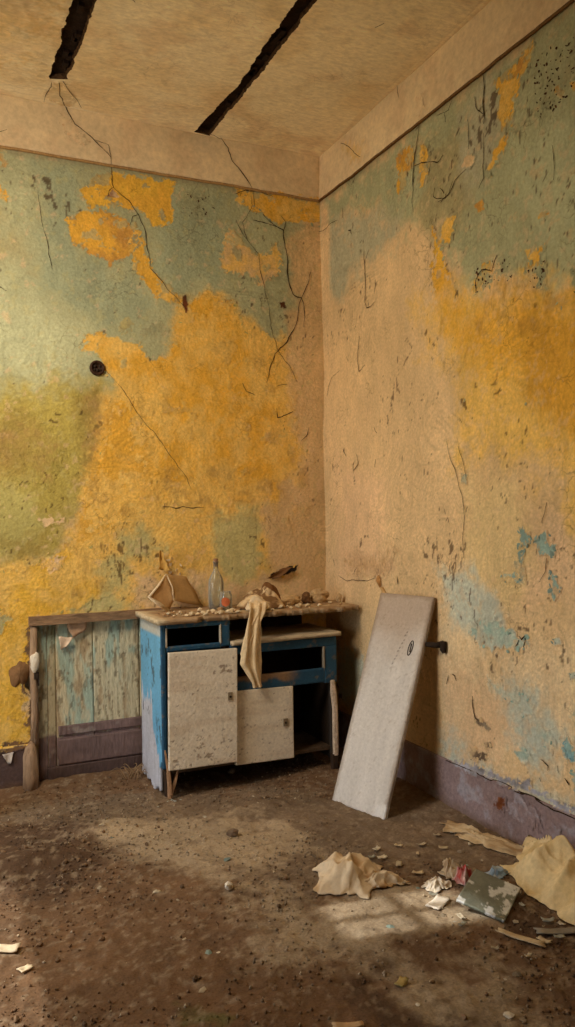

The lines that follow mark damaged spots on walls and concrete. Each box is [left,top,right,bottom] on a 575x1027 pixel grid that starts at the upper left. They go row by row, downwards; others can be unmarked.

peeling [461,22,575,179]
crack [44,82,184,306]
crack [206,133,311,394]
peeling [340,136,368,171]
peeling [394,143,430,200]
peeling [437,213,457,247]
peeling [467,243,549,302]
peeling [0,169,320,764]
crack [447,446,466,558]
peeling [500,525,562,602]
peeling [467,613,532,659]